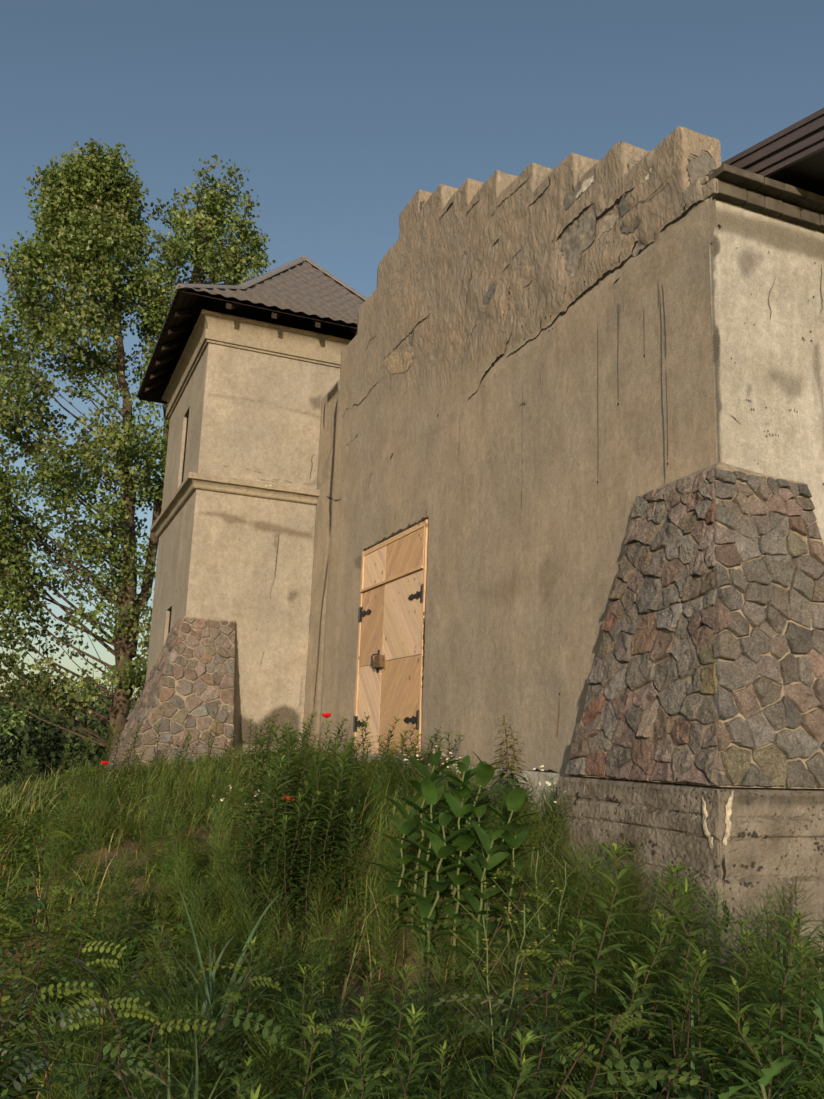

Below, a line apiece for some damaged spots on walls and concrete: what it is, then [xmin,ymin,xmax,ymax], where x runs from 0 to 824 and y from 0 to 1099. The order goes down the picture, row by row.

crack [439,177,550,288]
spalling [563,170,594,210]
spalling [558,195,638,294]
crack [551,183,669,243]
spalling [687,150,717,184]
crack [342,316,428,442]
crack [437,200,704,458]
damp [657,281,668,479]